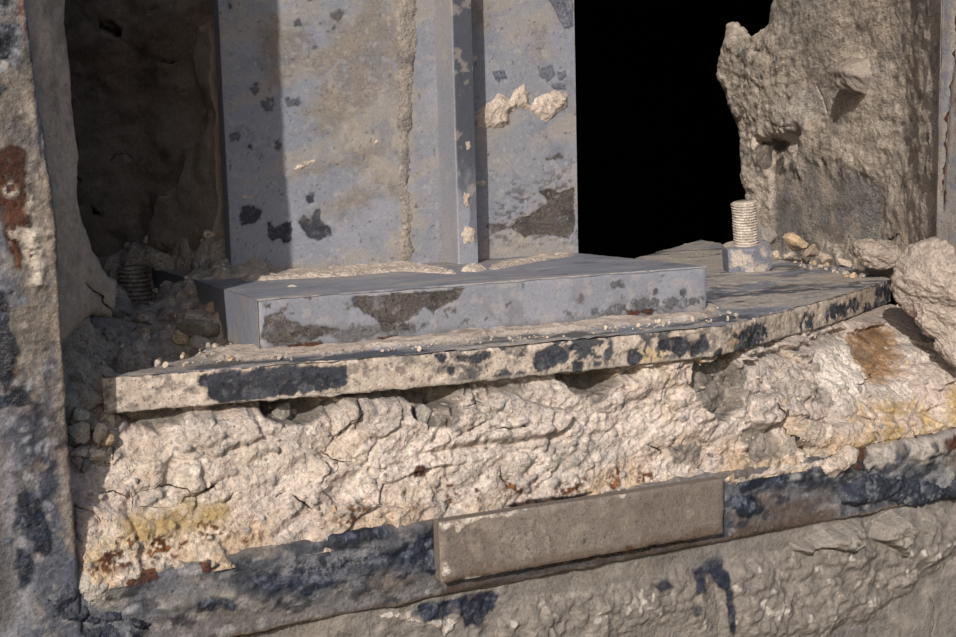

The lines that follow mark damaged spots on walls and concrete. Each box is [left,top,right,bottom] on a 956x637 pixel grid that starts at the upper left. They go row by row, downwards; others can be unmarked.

spalling [755,139,790,174]
corrosion [0,144,33,268]
peeling [487,187,575,238]
peeling [199,365,348,424]
spalling [412,350,491,427]
crack [319,403,364,470]
spalling [743,426,780,462]
crack [73,479,234,520]
crack [275,490,311,509]
peeling [738,472,786,494]
corrosion [92,534,188,586]
corrosion [200,562,216,572]